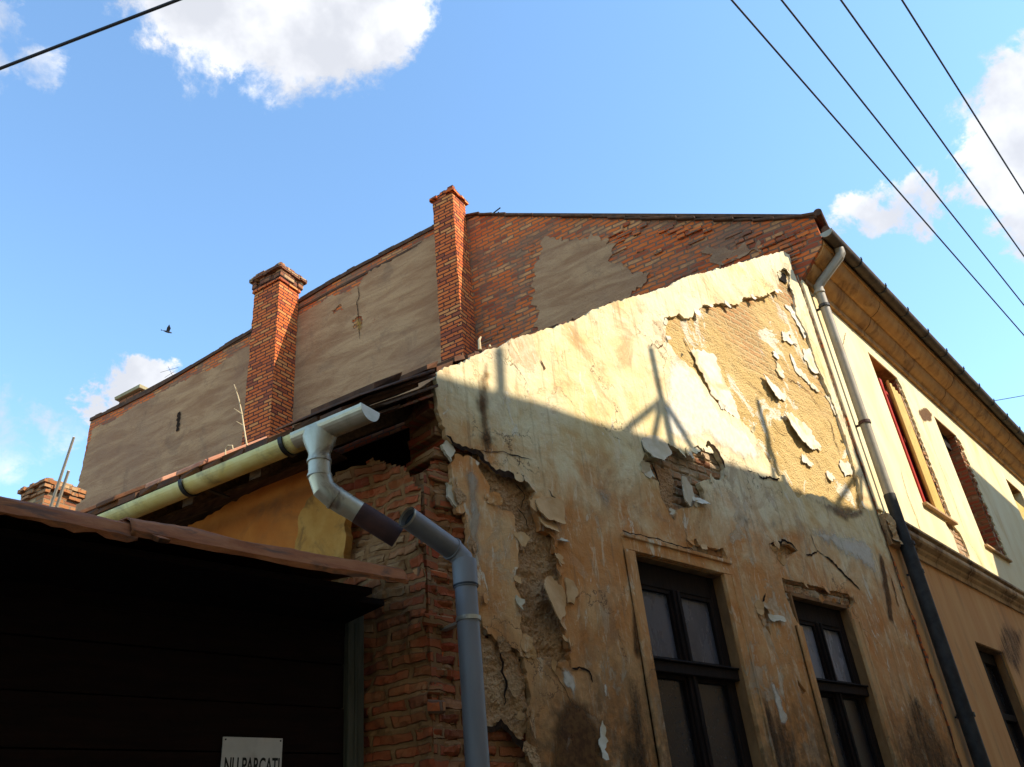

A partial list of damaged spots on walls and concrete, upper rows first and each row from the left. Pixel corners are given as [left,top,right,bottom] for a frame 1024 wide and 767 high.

flaking render [413,540,465,767]
flaking render [428,440,477,558]
flaking render [472,454,578,767]